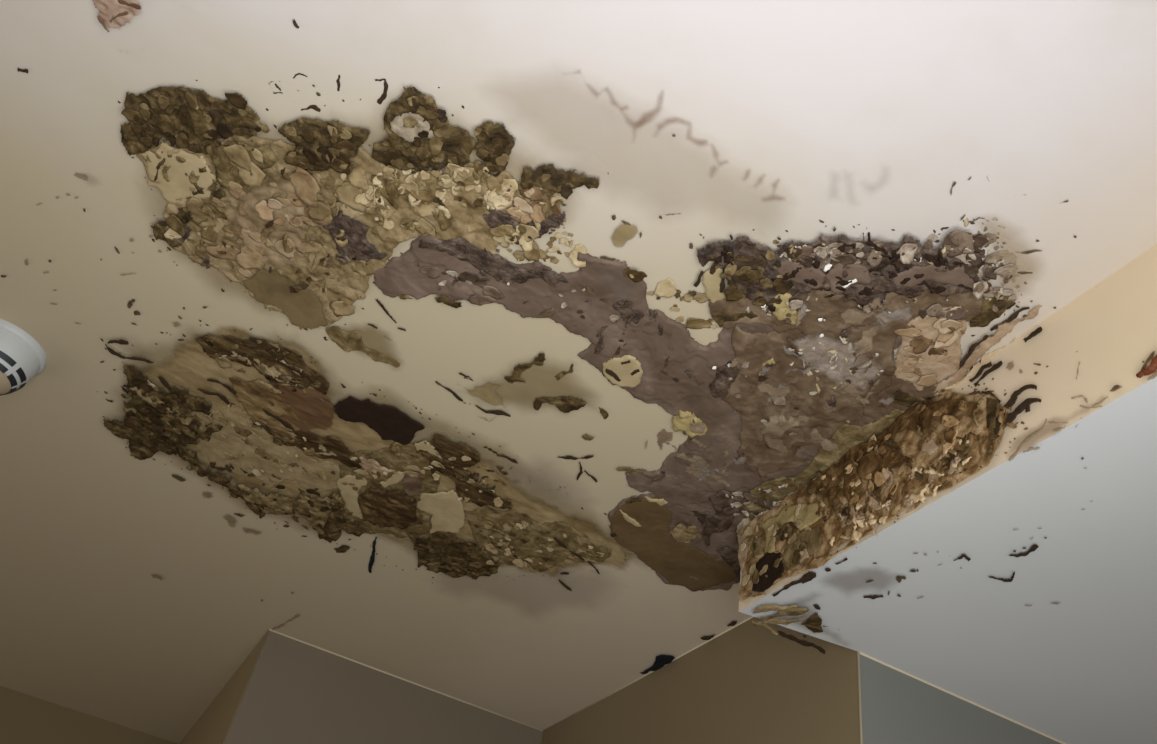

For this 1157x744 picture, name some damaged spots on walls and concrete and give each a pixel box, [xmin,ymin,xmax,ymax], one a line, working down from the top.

flaking render [97,73,1077,654]
rust [1136,351,1157,380]